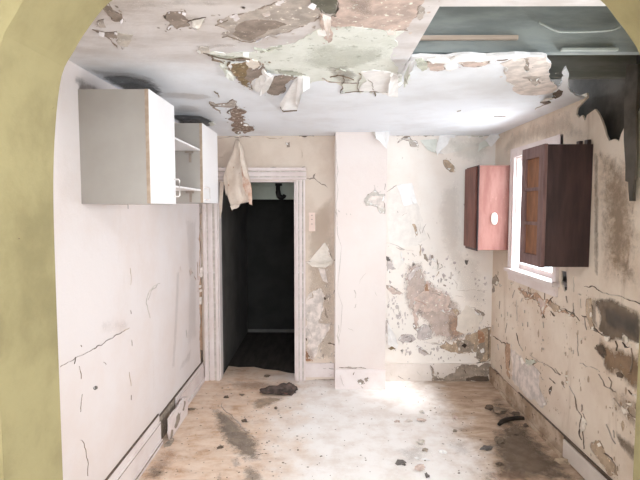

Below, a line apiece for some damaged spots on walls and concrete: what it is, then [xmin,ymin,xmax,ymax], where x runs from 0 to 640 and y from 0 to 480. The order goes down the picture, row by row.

peeling [92,3,133,50]
peeling [157,0,563,112]
spalling [209,91,255,137]
water stain [608,166,627,267]
crack [60,310,132,379]
peeling [305,243,335,363]
spalling [360,177,639,415]
crack [493,333,587,449]
crack [566,276,640,420]
spalling [589,431,620,479]